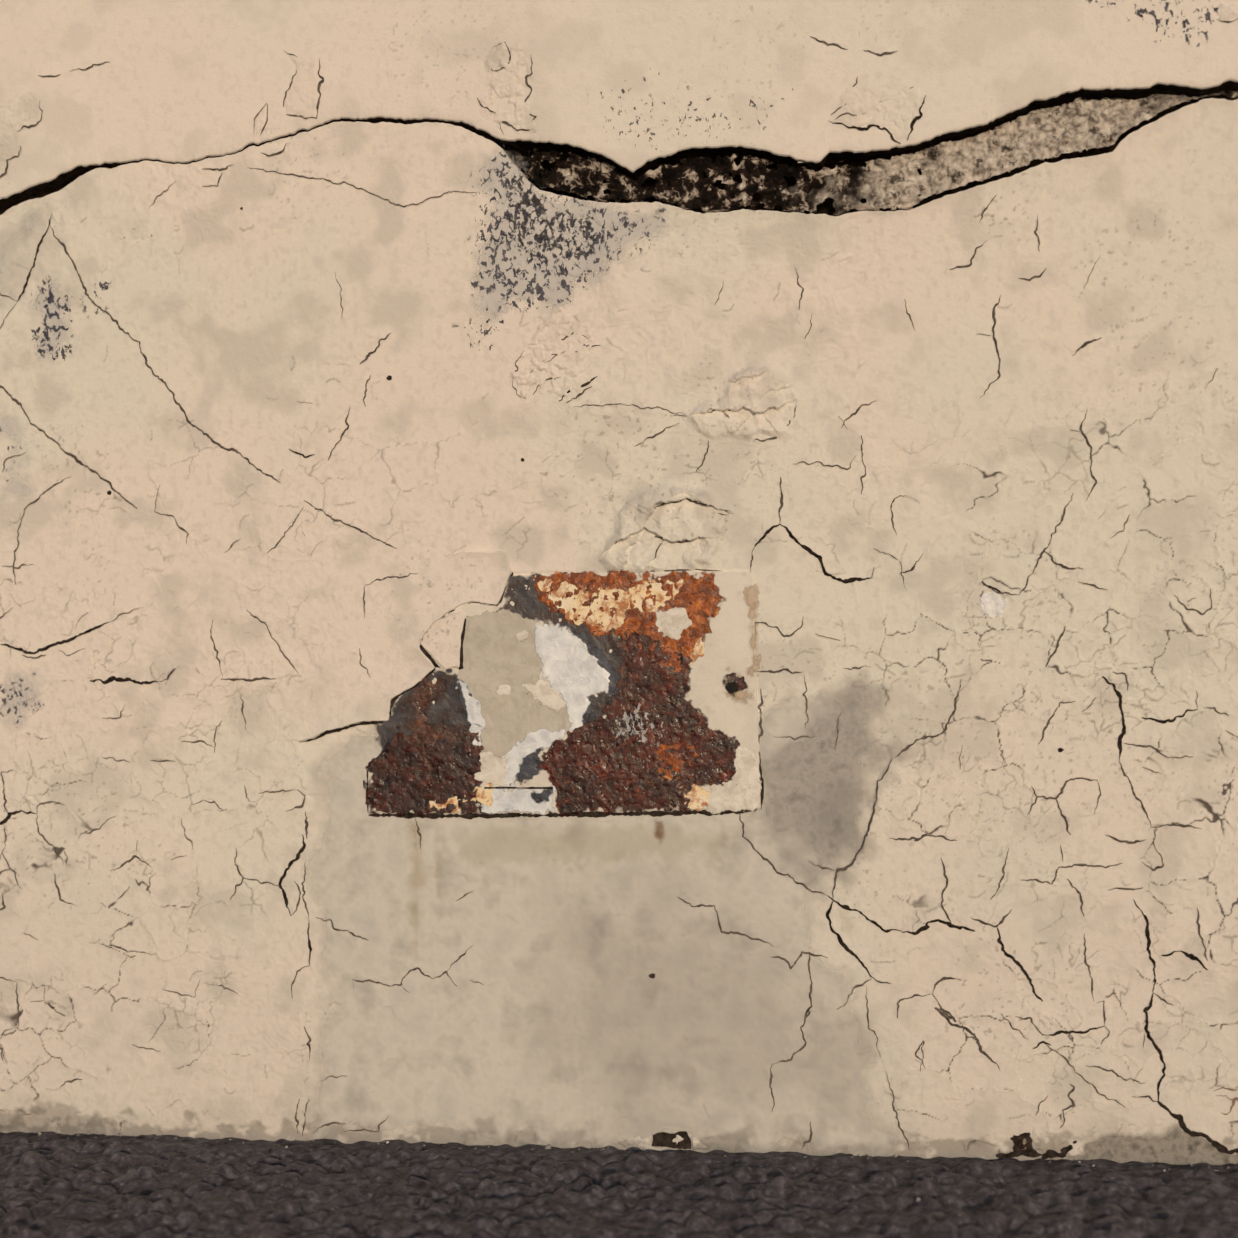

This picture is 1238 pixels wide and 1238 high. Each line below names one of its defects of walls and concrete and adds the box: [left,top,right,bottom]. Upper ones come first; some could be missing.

peeling [1088,0,1238,47]
peeling [250,143,685,415]
crack [0,81,1238,494]
crack [0,385,189,584]
crack [750,477,923,591]
crack [983,412,1106,595]
crack [230,811,369,997]
rust [363,677,491,817]
peeling [286,551,892,1155]
rust [533,570,740,838]
leakage [767,682,876,858]
crack [678,668,1238,1154]